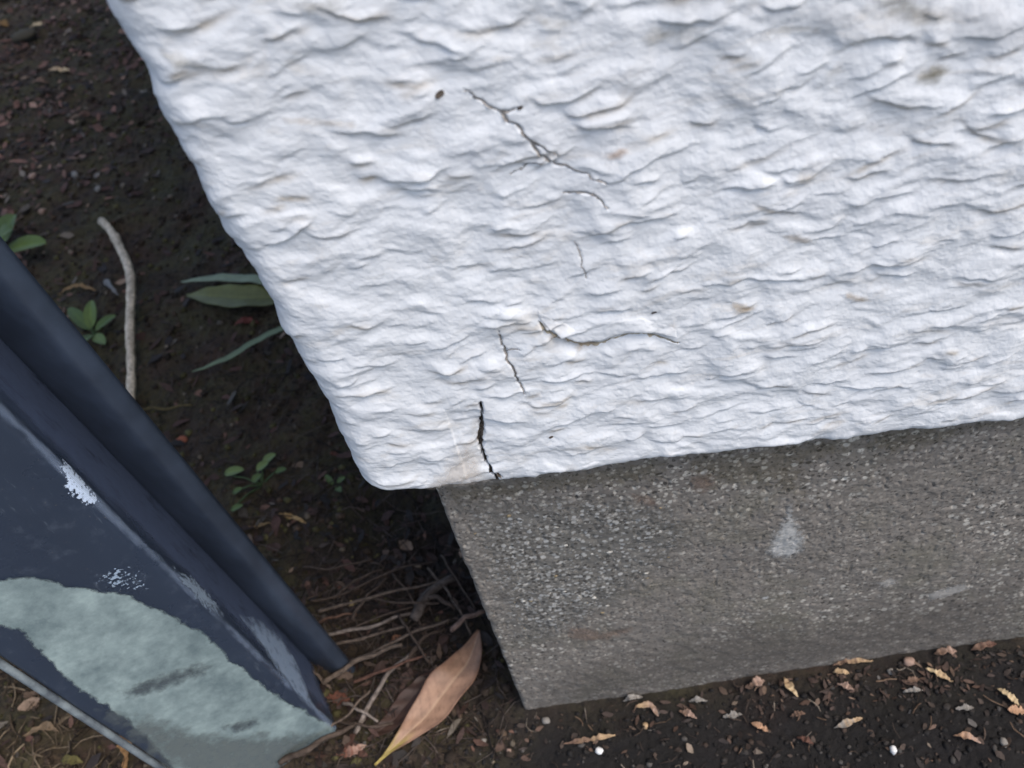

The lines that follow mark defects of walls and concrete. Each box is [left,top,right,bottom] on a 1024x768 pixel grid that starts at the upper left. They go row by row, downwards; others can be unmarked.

crack [464,90,609,209]
crack [498,331,525,392]
crack [477,401,502,480]